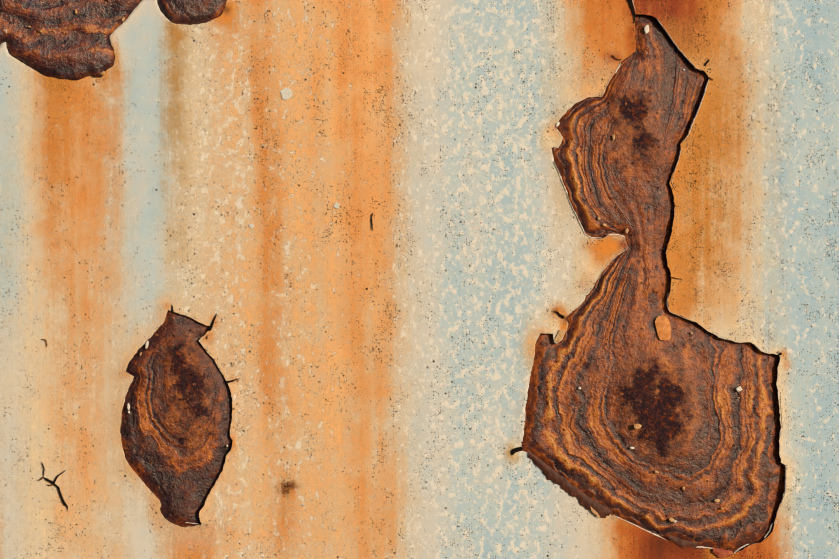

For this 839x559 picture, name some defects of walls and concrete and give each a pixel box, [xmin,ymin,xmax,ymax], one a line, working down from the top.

peeling [0,0,142,81]
peeling [157,0,227,25]
crack [627,0,636,23]
corrosion [542,113,564,152]
corrosion [20,54,137,559]
corrosion [159,0,408,559]
corrosion [523,305,577,366]
peeling [521,14,786,558]
corrosion [555,0,793,559]
peeling [120,310,233,527]
crack [37,462,68,511]
corrosion [149,494,162,523]